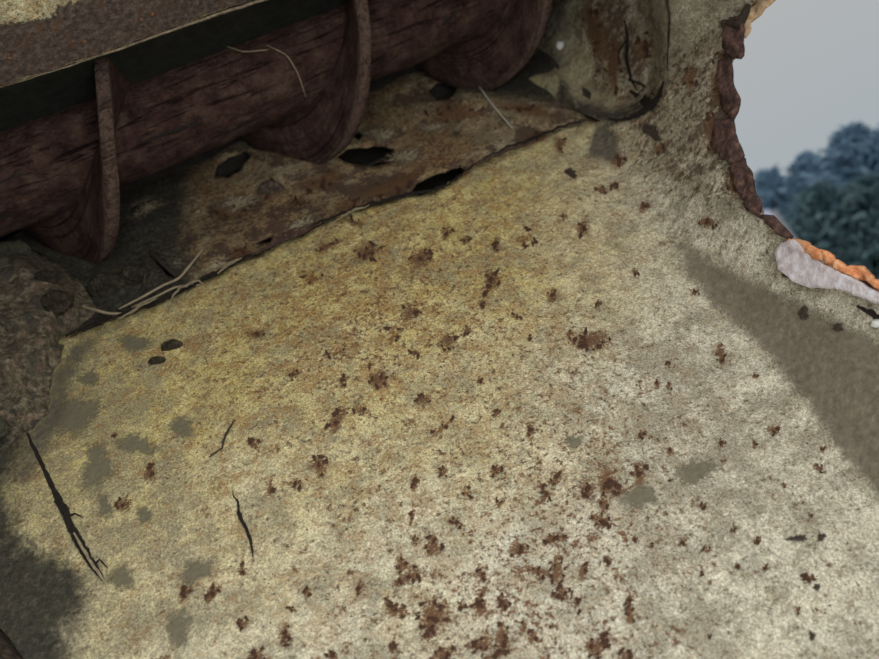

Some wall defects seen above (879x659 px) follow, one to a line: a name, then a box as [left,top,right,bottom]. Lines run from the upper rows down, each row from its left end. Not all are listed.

peeling [0,0,251,87]
peeling [773,239,879,305]
rust [560,326,618,352]
rust [324,399,369,438]
crack [26,432,112,582]
rust [580,461,649,531]
rust [243,624,293,659]
rust [384,503,518,659]
rust [506,532,591,615]
rust [581,629,636,659]
rust [624,587,635,630]
rust [800,572,821,584]